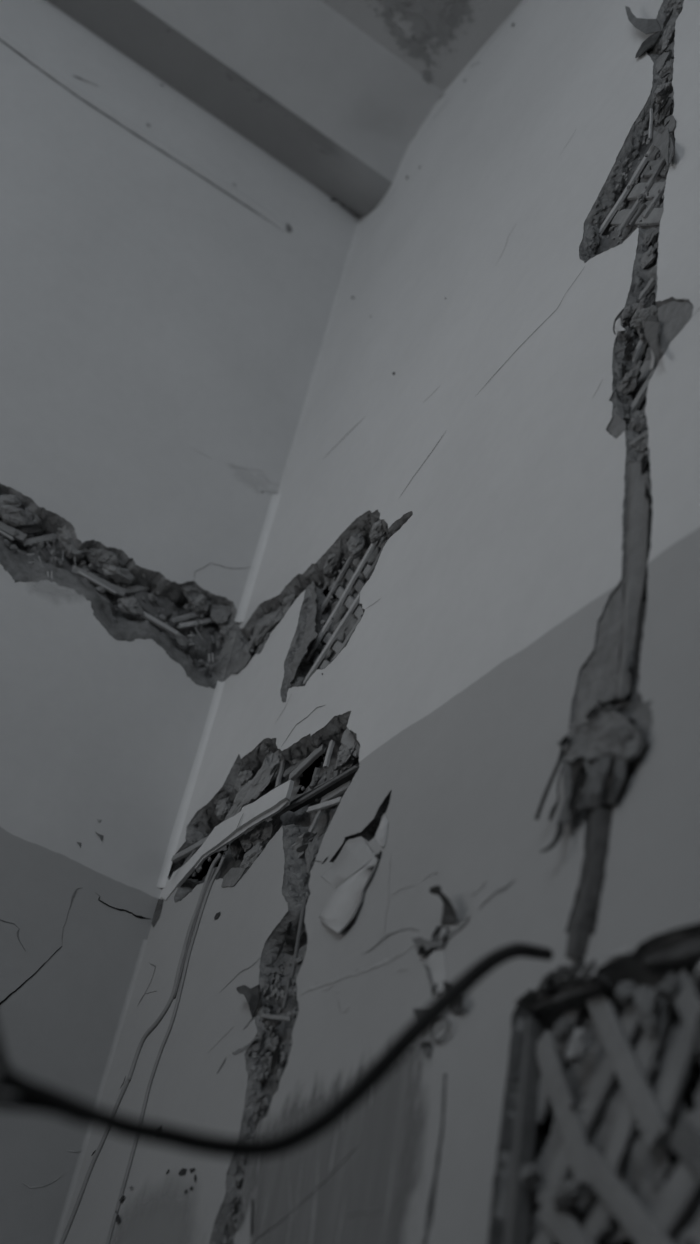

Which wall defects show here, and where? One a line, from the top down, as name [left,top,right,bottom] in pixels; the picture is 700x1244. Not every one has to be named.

flaking render [0,483,413,703]
spalling [488,0,700,1244]
flaking render [152,711,392,1139]
spalling [412,885,470,1017]
flaking render [166,1168,197,1194]
flaking render [209,997,464,1244]